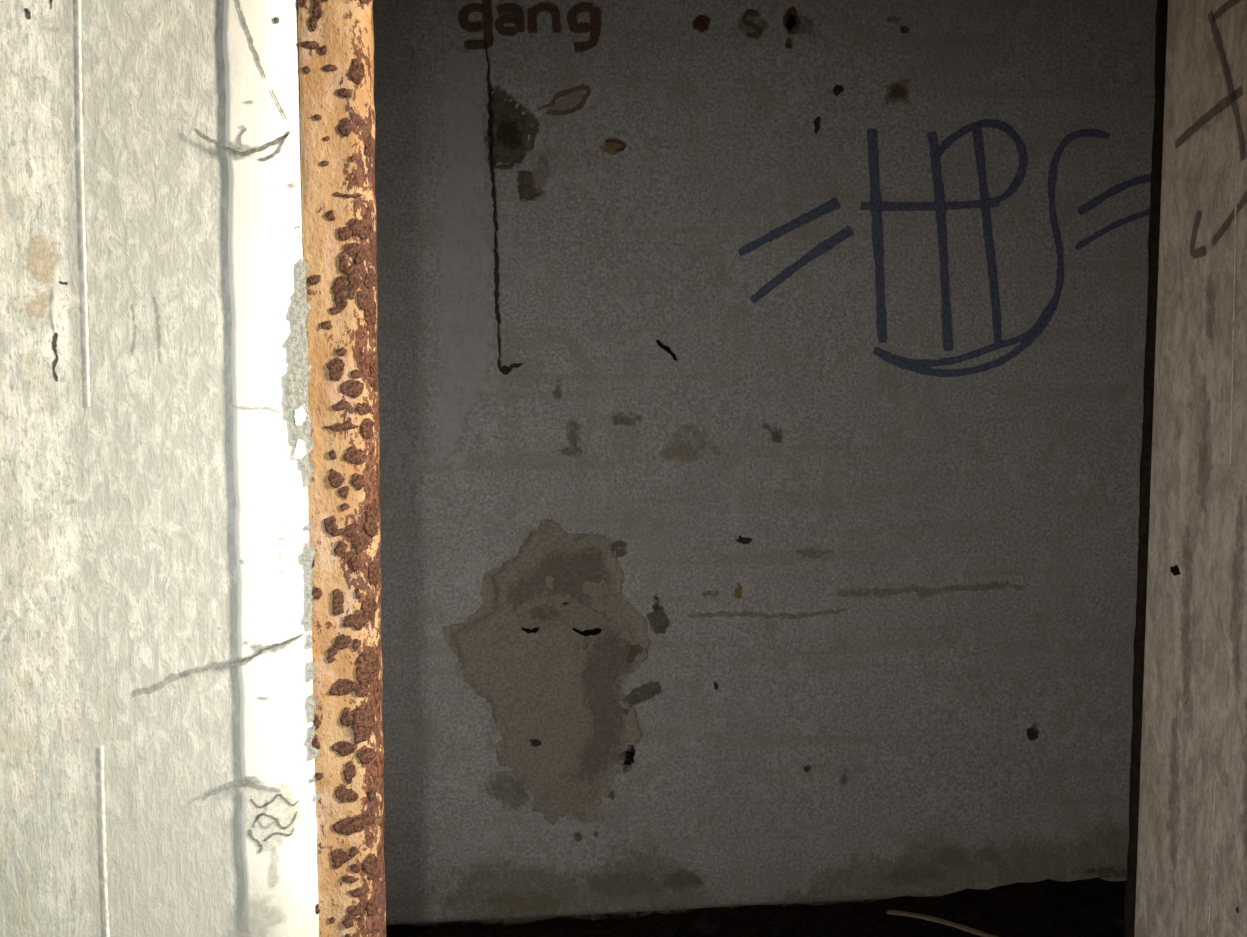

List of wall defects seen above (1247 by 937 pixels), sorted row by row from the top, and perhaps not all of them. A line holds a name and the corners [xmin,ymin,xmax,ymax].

crack [194,0,291,161]
rust [299,0,365,97]
rust [323,117,351,141]
rust [350,142,374,162]
rust [308,192,376,330]
crack [195,634,304,672]
rust [312,347,381,937]